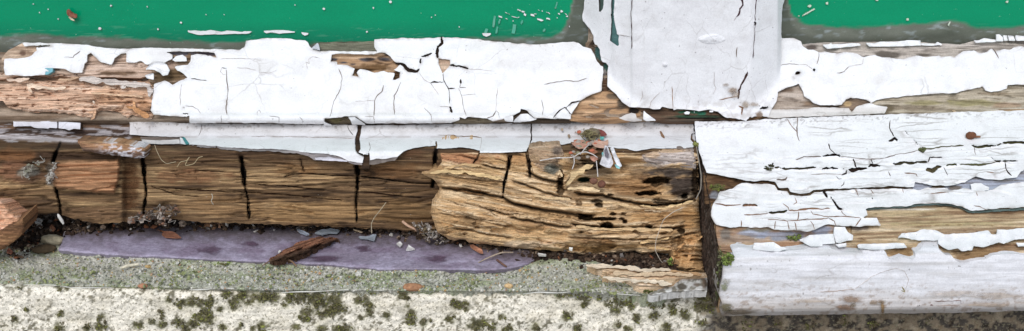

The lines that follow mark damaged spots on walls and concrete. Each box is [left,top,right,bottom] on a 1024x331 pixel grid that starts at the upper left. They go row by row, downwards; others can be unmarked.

crack [52,143,61,162]
peeling [78,48,216,87]
peeling [140,137,190,146]
crack [141,36,499,222]
peeling [315,116,374,169]
crack [502,78,586,196]
peeling [453,40,732,125]
crack [714,0,1024,230]
peeling [772,84,1024,115]
peeling [703,173,780,204]
peeling [911,170,1024,191]
peeling [715,205,1024,260]